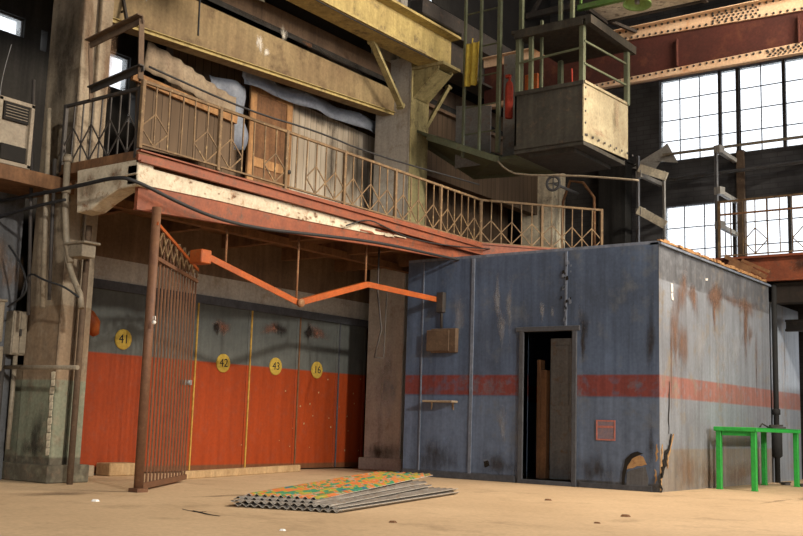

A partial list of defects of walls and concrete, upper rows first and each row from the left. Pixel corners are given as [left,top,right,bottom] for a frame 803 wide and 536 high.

corrosion [710,288,721,326]
corrosion [671,317,687,385]
spalling [622,444,659,486]